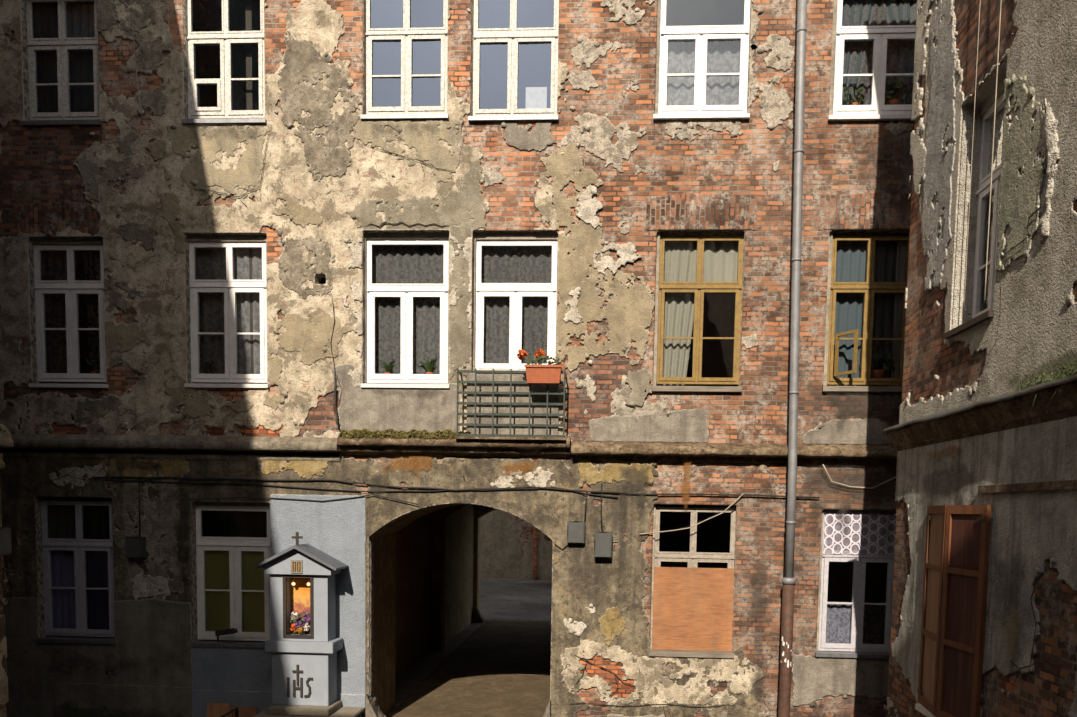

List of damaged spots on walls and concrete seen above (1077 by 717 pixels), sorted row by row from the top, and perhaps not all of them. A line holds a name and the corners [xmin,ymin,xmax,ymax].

spalling [3,361,146,435]
peeling [104,253,144,313]
spalling [0,0,270,254]
peeling [158,192,363,437]
peeling [265,0,671,442]
leakage [812,473,896,495]
peeling [901,0,1017,405]
peeling [995,74,1047,271]
peeling [0,636,9,717]
peeling [560,604,764,717]
spalling [801,499,927,717]
spalling [981,557,1077,717]